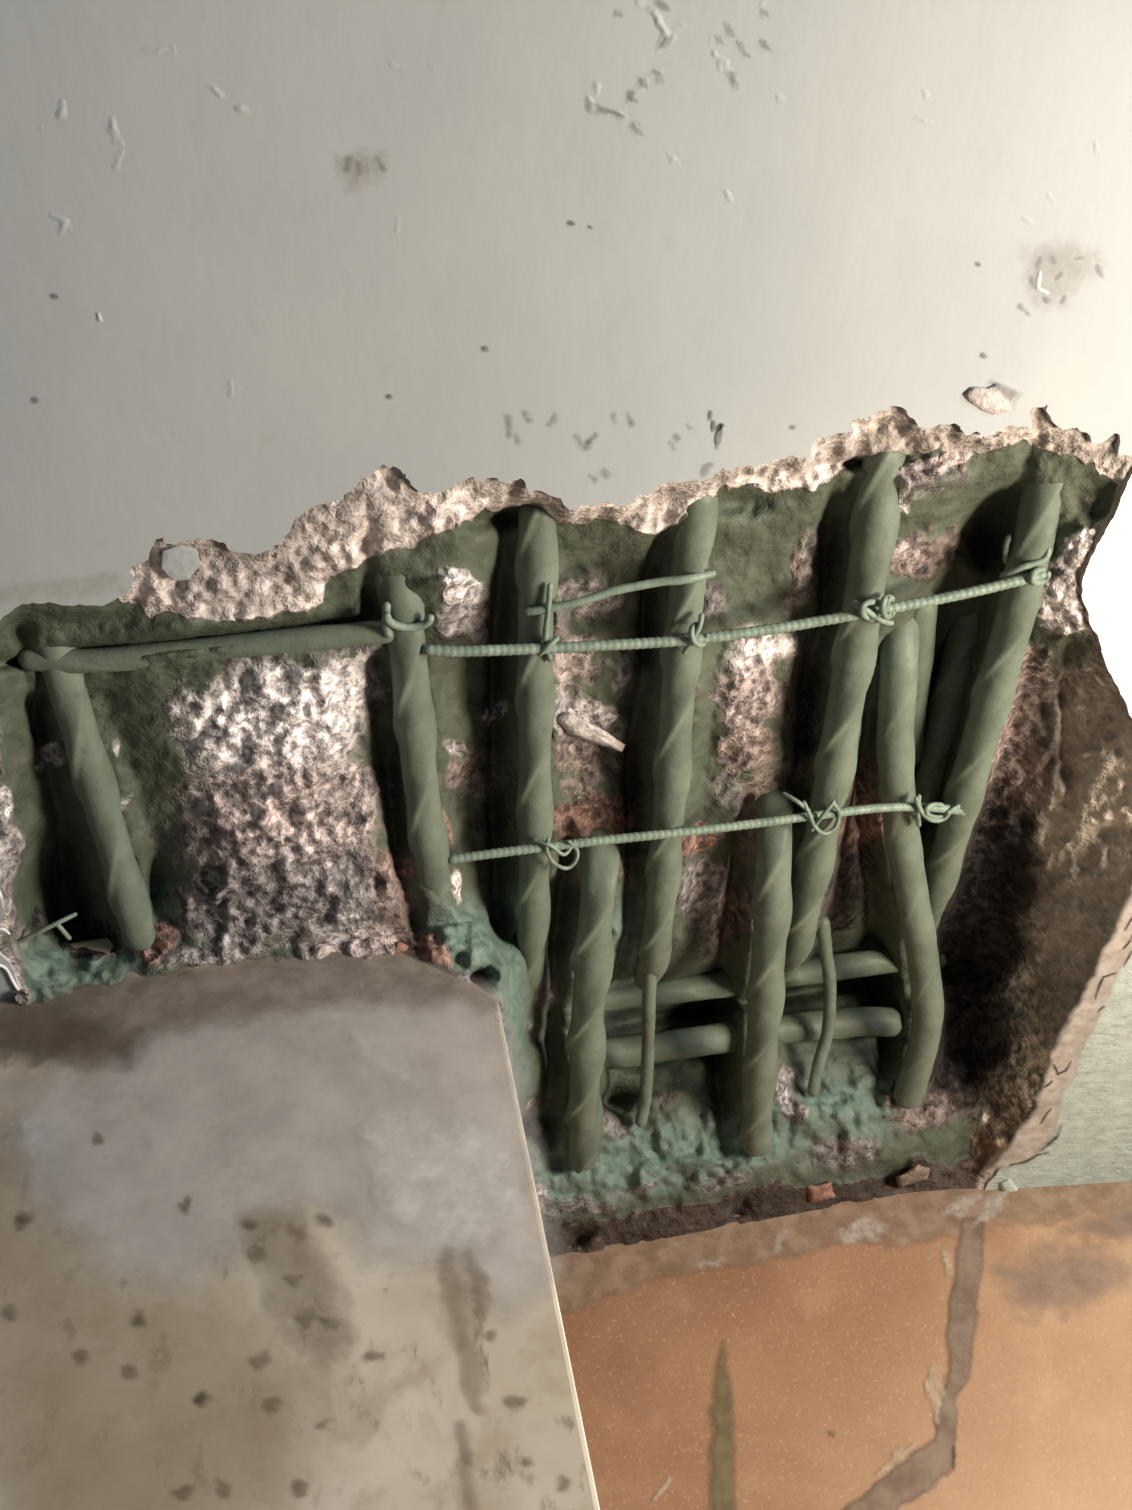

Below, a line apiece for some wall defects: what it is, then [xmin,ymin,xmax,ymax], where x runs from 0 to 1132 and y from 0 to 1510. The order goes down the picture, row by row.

spalling [0,384,1132,1257]
damp [19,992,542,1294]
crack [844,1218,984,1510]